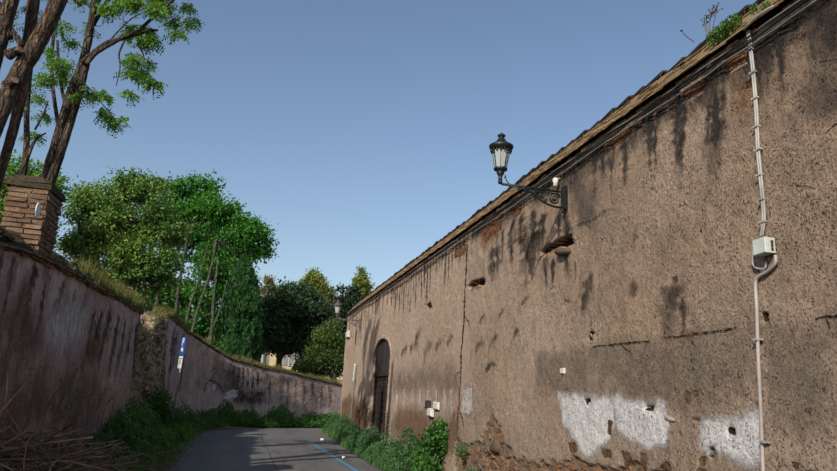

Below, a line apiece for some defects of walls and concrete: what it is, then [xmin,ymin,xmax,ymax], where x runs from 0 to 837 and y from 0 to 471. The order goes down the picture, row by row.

water stain [349,0,837,339]
water stain [0,254,138,447]
water stain [220,359,297,405]
crack [455,245,469,433]
crack [590,320,736,352]
spalling [385,386,670,471]
peeling [692,410,761,471]